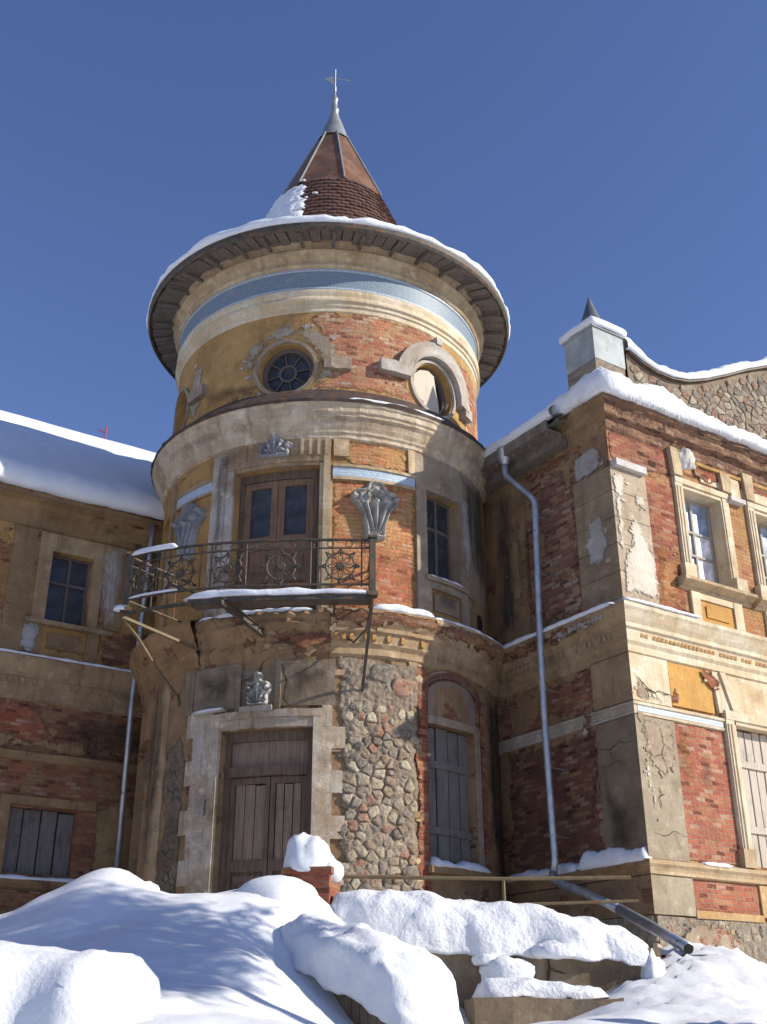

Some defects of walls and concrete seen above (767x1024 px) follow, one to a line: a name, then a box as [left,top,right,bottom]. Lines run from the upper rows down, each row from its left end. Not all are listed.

spalling [228,312,432,406]
spalling [505,423,682,641]
flaking render [20,621,39,652]
crack [634,672,671,703]
spalling [702,670,721,690]